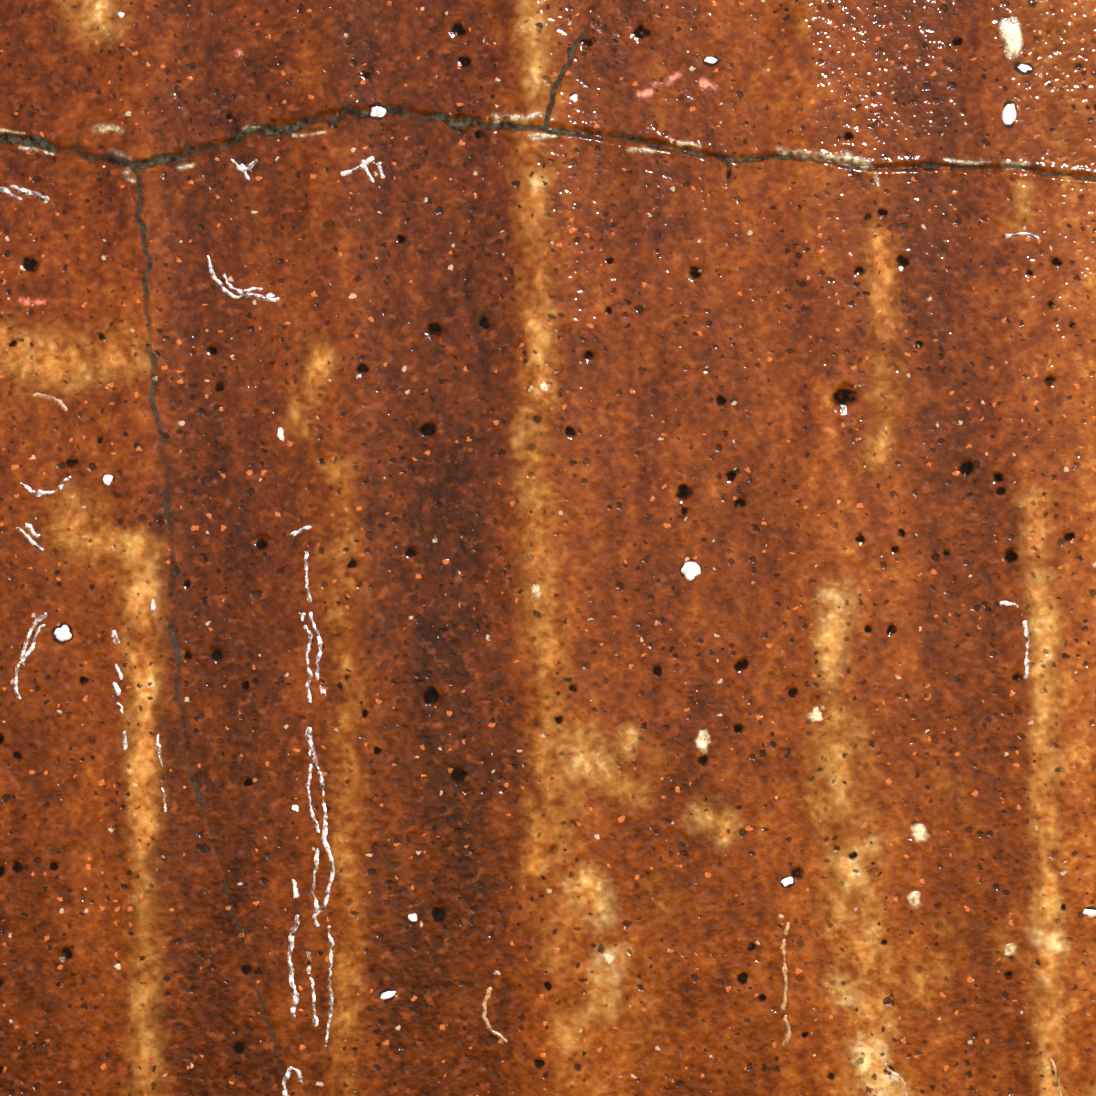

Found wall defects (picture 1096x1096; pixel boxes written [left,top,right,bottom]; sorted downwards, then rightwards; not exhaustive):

crack [225,40,598,148]
corrosion [699,79,717,90]
crack [624,135,1096,186]
crack [0,125,194,316]
crack [148,348,164,445]
water stain [516,3,578,885]
crack [163,493,171,523]
crack [169,619,181,690]
water stain [571,728,642,799]
water stain [572,872,606,917]
water stain [558,1020,575,1052]